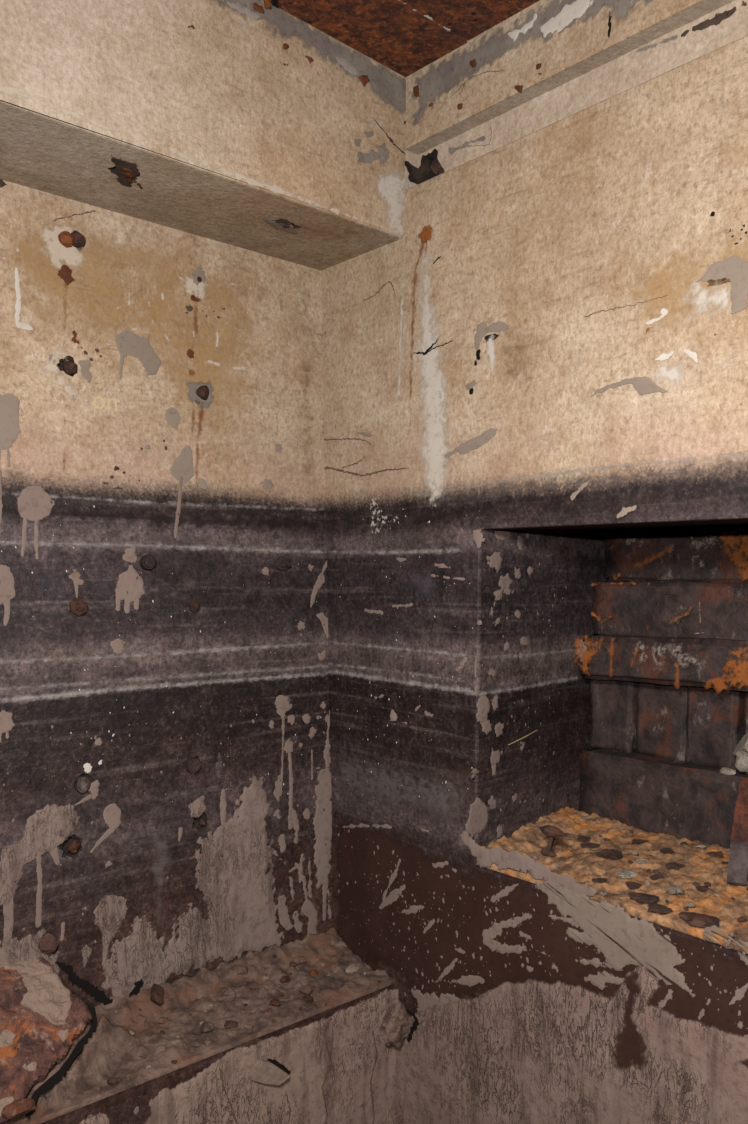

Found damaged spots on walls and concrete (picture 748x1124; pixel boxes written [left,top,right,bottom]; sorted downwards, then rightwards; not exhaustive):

peeling [638,1,747,52]
peeling [218,0,651,125]
spalling [354,131,394,163]
rust [414,225,433,285]
spalling [692,224,748,314]
water stain [376,257,564,554]
water stain [62,497,355,554]
water stain [0,654,577,702]
rust [574,635,614,676]
rust [632,642,697,687]
rust [706,648,748,693]
water stain [337,824,748,1068]